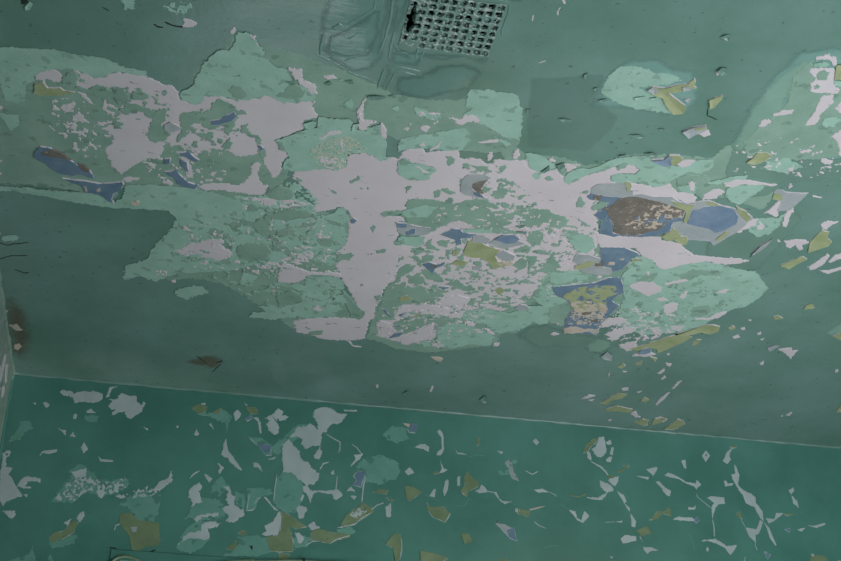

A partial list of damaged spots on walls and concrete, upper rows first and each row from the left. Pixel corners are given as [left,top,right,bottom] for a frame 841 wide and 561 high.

peeling [120,0,135,10]
peeling [154,1,197,28]
peeling [0,27,841,380]
peeling [0,353,8,396]
peeling [60,386,145,422]
peeling [0,421,41,519]
peeling [47,511,84,561]
peeling [176,403,418,561]
peeling [404,430,545,528]
peeling [496,523,517,541]
peeling [570,437,737,555]
peeling [723,444,799,559]